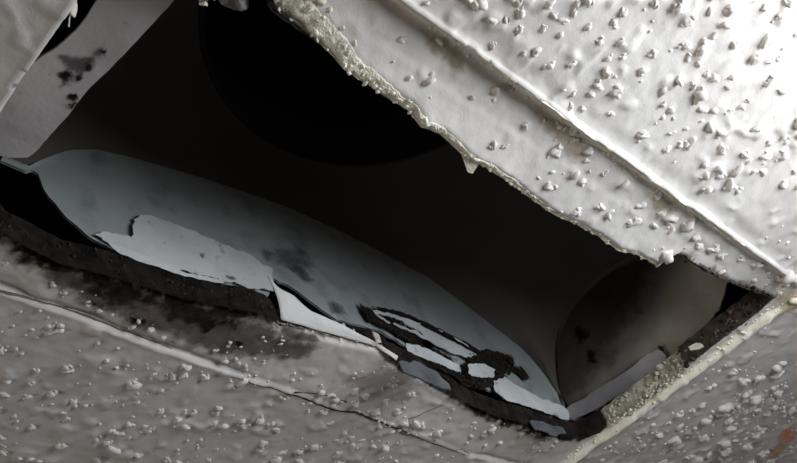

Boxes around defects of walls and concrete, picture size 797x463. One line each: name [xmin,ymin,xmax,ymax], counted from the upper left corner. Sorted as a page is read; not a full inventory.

flaking render [272,0,664,267]
peeling [95,215,274,291]
peeling [373,310,687,426]
rust [769,427,794,459]